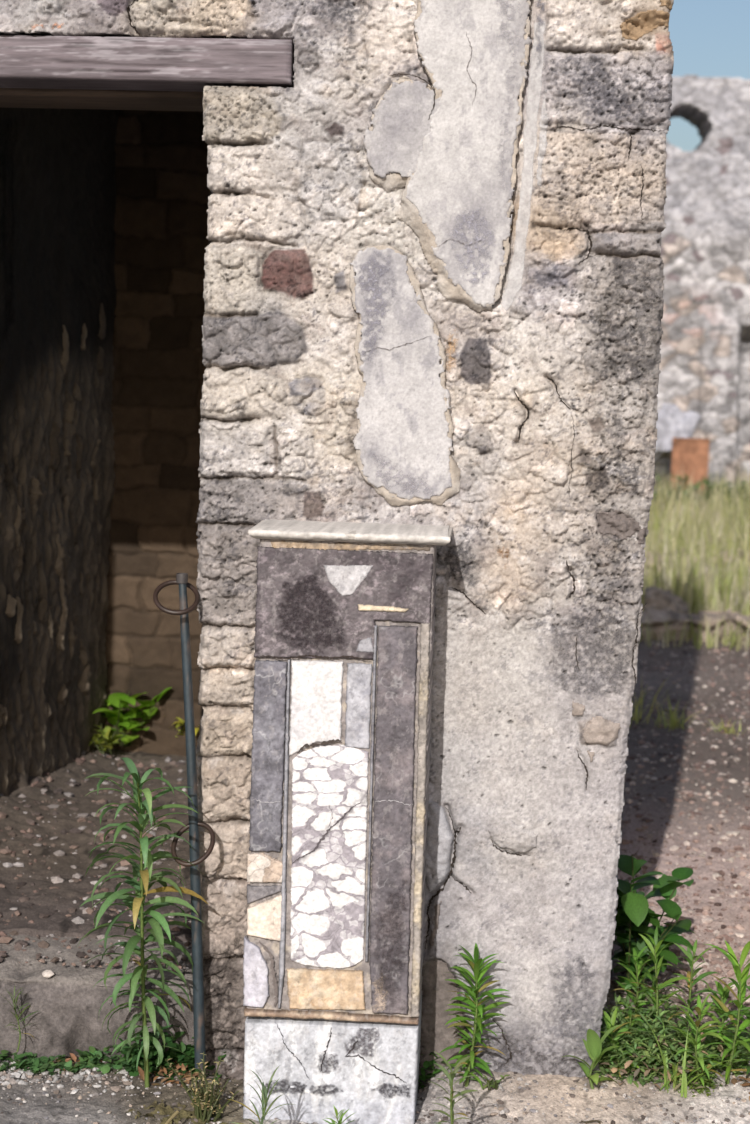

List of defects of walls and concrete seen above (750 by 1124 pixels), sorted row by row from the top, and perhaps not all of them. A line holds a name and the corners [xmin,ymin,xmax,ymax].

crack [557,125,666,221]
crack [564,228,592,265]
crack [514,391,529,443]
crack [547,377,578,501]
crack [425,807,471,949]
crack [259,940,404,1082]